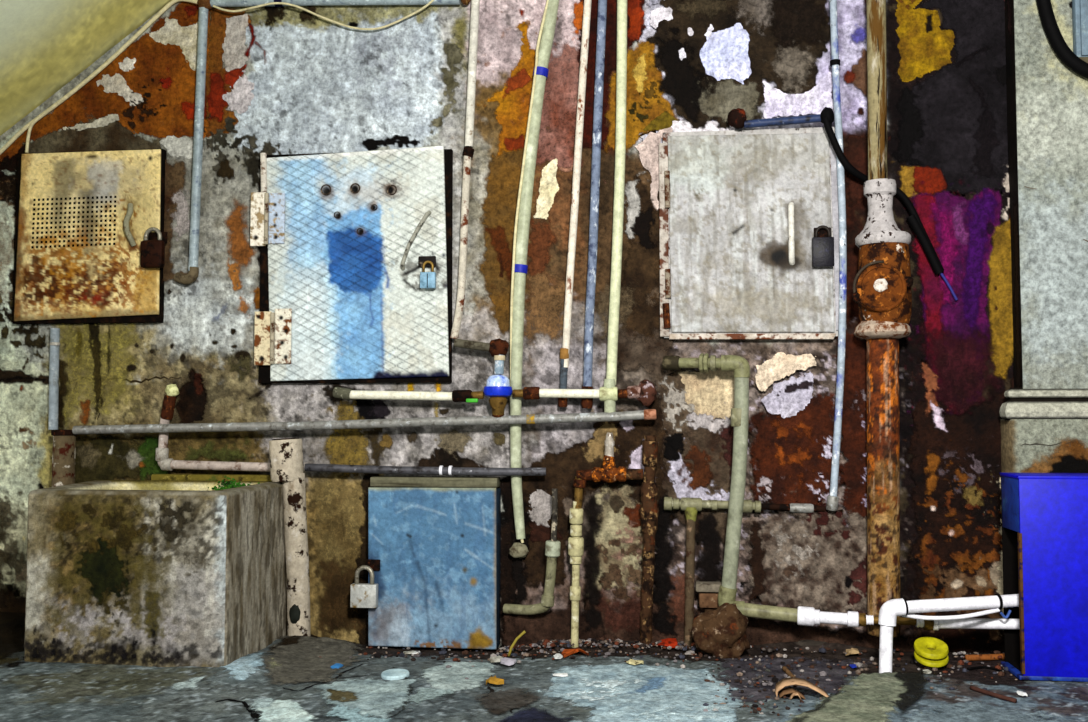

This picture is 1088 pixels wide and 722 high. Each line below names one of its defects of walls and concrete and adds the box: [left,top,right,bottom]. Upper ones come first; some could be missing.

peeling [0,1,266,251]
peeling [487,9,536,157]
peeling [534,159,574,219]
peeling [573,0,763,210]
spalling [0,270,50,391]
spalling [19,428,36,449]
water stain [47,323,139,430]
spalling [228,329,272,399]
spalling [508,328,734,618]
rust [748,331,867,518]
water stain [0,491,212,668]